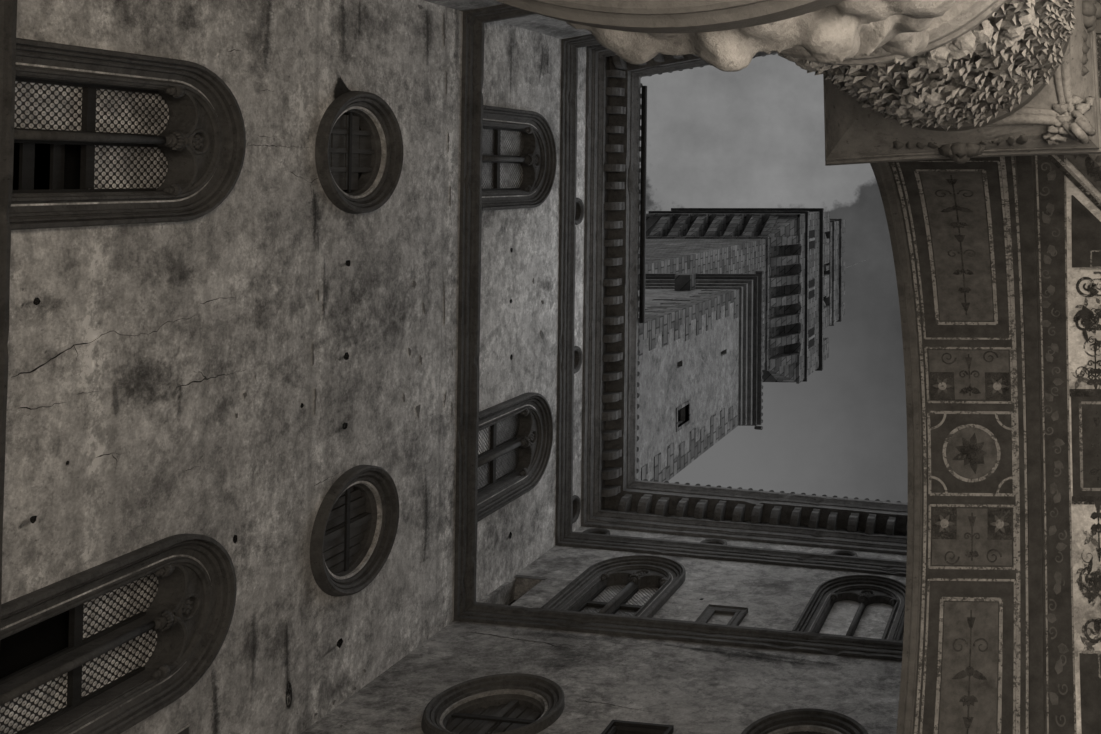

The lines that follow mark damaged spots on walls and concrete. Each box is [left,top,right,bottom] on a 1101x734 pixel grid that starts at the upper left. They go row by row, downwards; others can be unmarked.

crack [13,297,235,377]
crack [179,369,246,387]